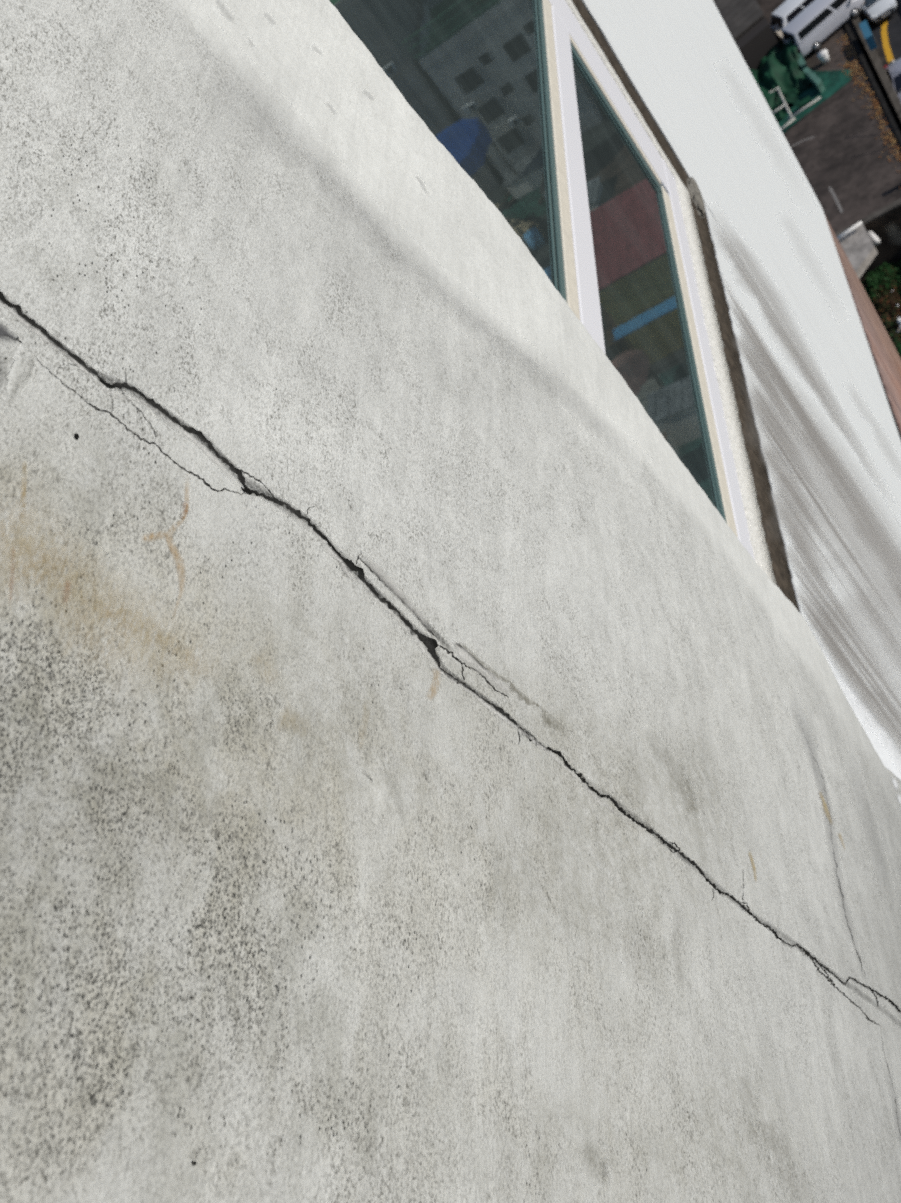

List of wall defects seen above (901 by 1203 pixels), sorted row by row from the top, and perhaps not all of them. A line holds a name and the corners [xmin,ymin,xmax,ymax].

crack [0,291,901,1025]